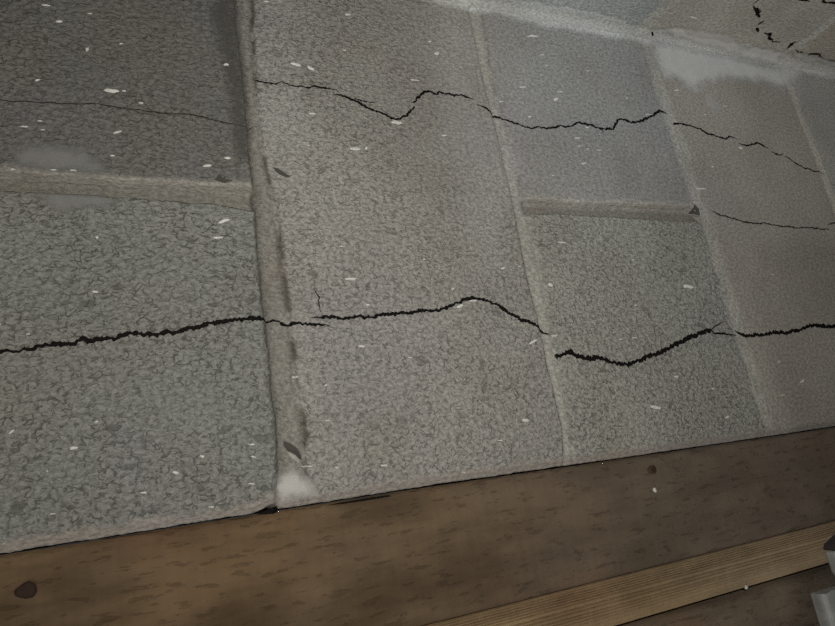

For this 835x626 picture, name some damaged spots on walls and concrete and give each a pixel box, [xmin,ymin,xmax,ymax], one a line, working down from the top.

crack [752,0,835,62]
leakage [654,43,833,92]
crack [255,80,821,173]
crack [712,211,835,230]
crack [0,289,550,354]
crack [554,321,835,368]
spalling [283,441,302,464]